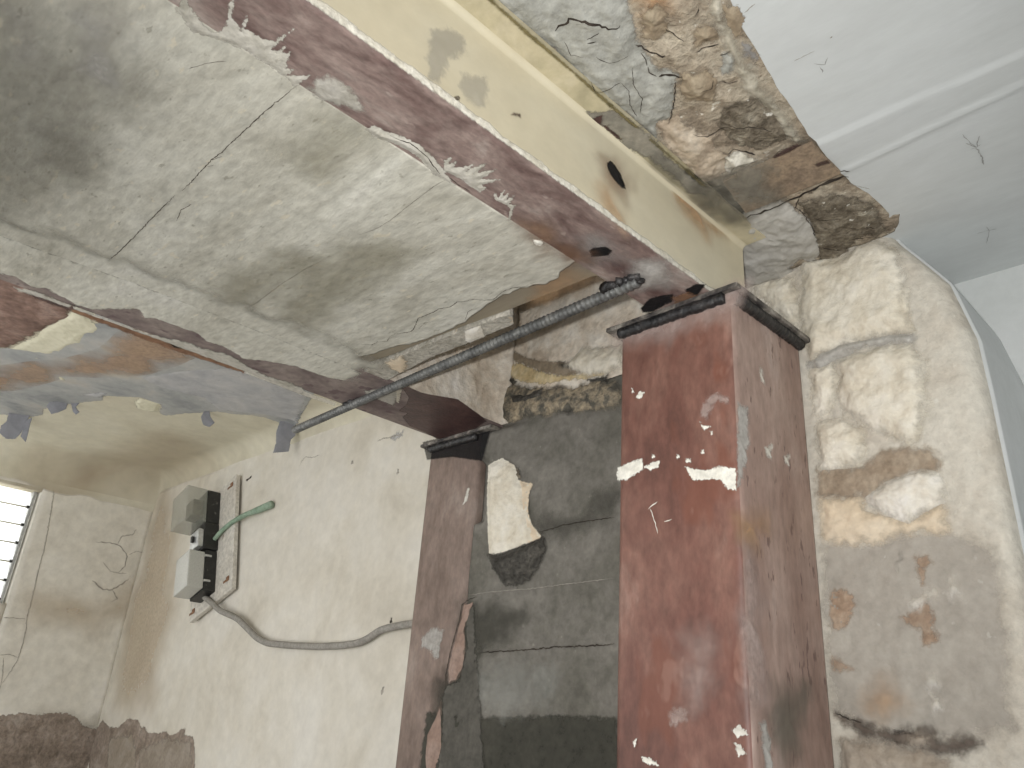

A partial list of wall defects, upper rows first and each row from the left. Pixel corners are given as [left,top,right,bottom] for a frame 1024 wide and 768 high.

crack [555,18,730,120]
flaking render [586,0,800,194]
crack [110,91,290,260]
peeling [0,307,314,453]
flaking render [487,458,541,554]
peeling [616,455,660,481]
peeling [676,405,749,490]
crack [93,530,142,602]
peeling [445,596,478,684]
crack [483,644,613,653]
peeling [426,708,442,768]
peeling [761,723,773,768]